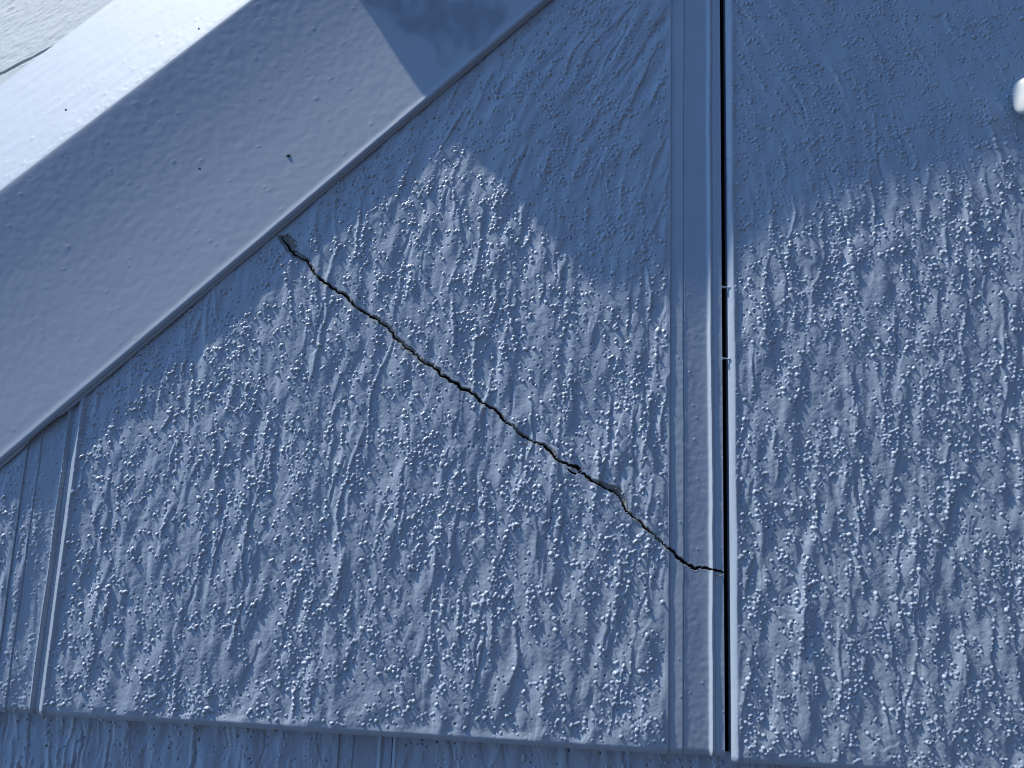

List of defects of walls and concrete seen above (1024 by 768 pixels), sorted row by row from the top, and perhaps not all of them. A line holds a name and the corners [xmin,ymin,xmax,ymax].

crack [277,232,724,576]